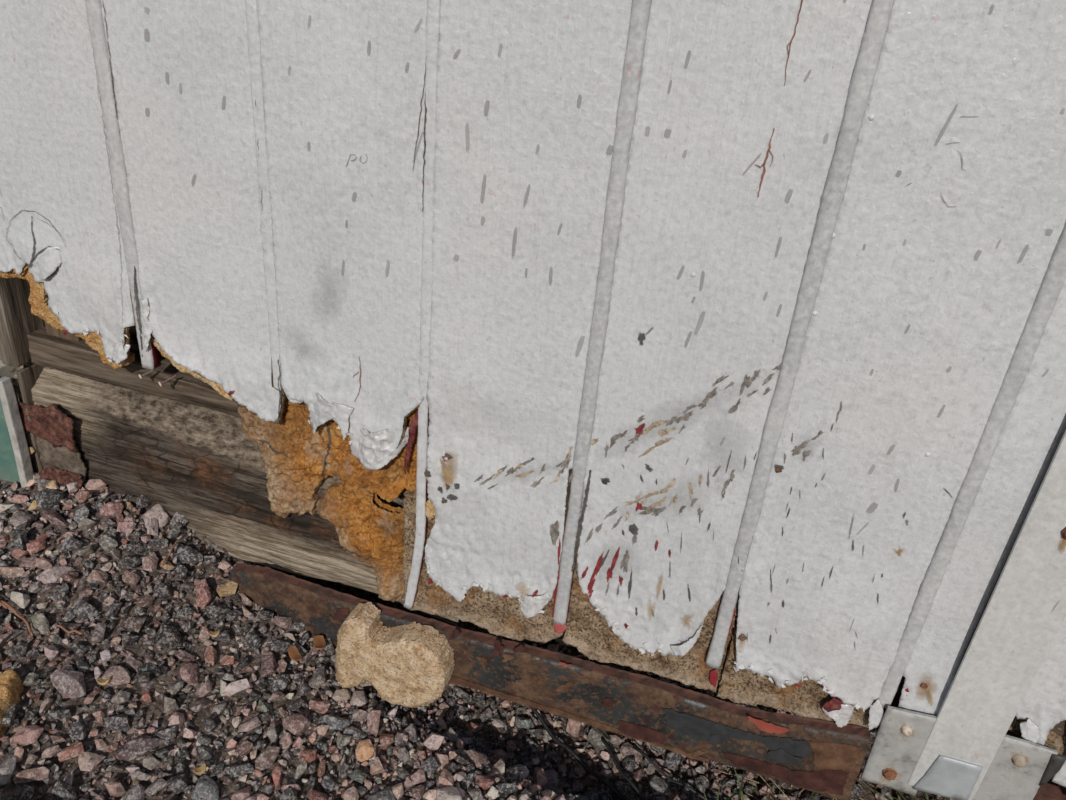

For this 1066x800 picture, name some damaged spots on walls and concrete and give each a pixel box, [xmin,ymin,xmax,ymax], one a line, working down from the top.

crack [784,0,803,85]
crack [755,128,775,197]
peeling [38,246,62,280]
peeling [106,334,131,364]
peeling [141,298,153,352]
peeling [17,402,87,489]
peeling [286,393,409,470]
peeling [502,590,550,618]
peeling [629,621,704,657]
corrosion [448,676,708,762]
peeling [767,668,883,730]
corrosion [723,742,861,795]